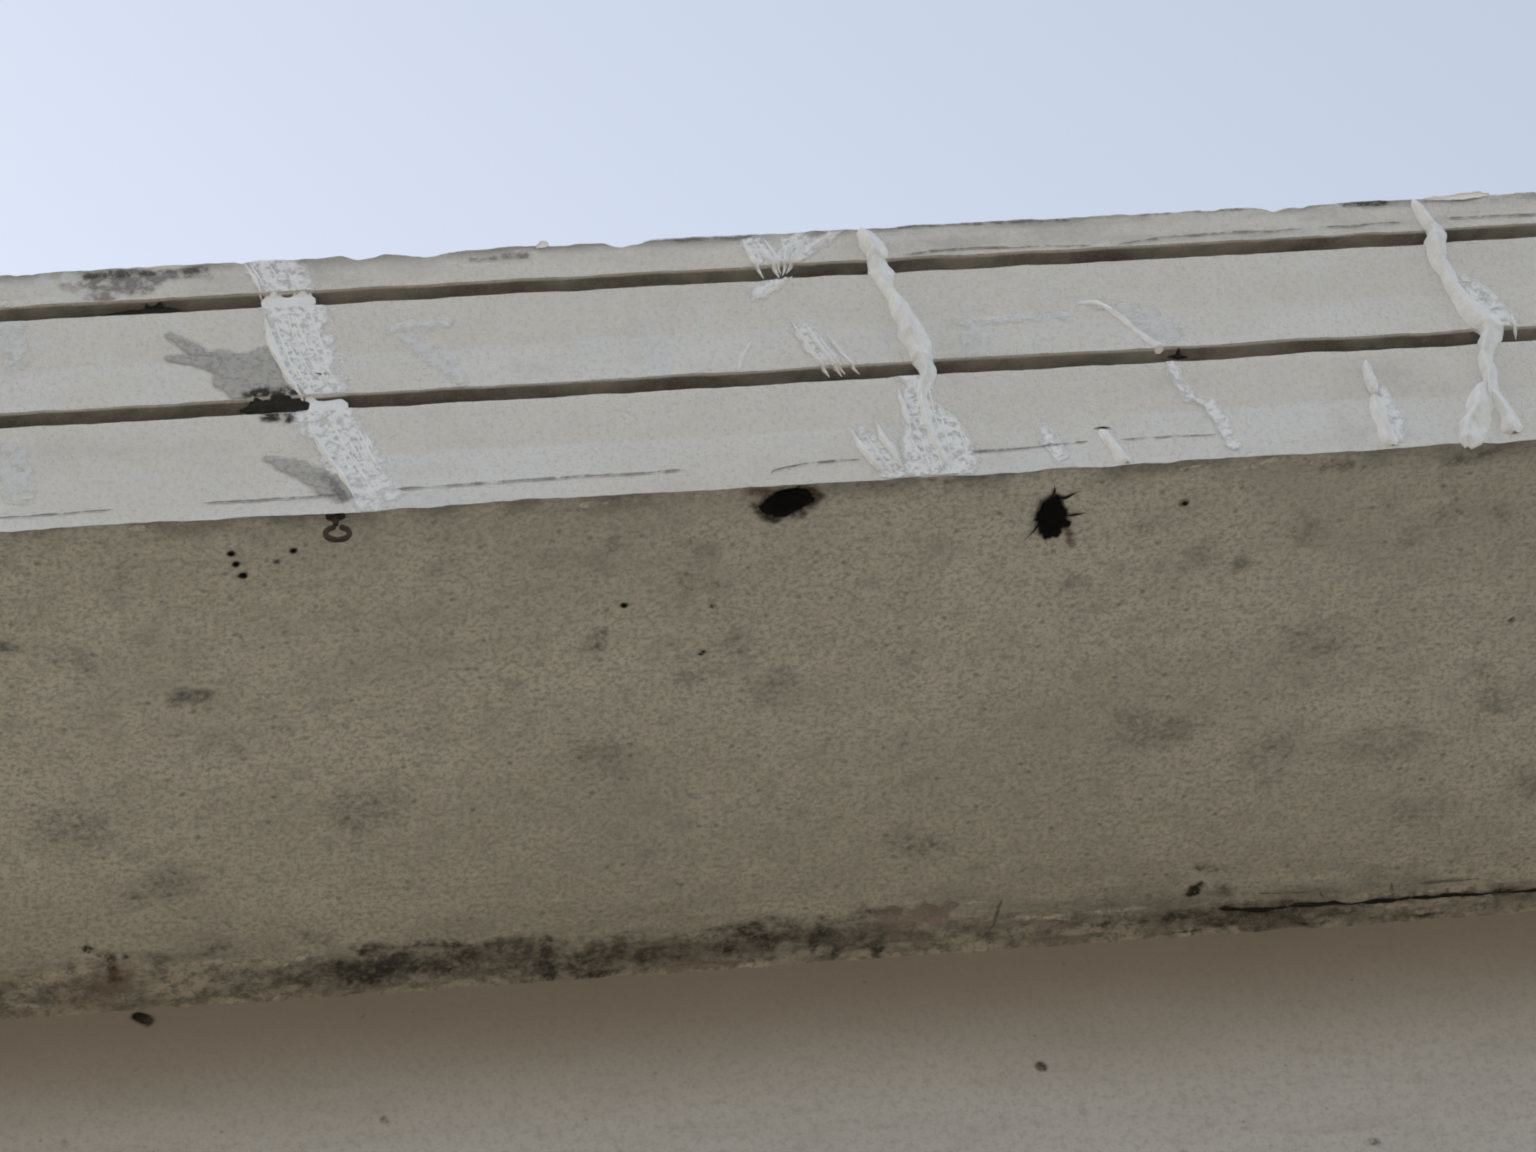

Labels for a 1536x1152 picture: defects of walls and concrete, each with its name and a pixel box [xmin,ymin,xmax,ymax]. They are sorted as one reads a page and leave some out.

crack [961,426,1214,453]
crack [397,469,686,489]
crack [771,459,859,474]
crack [208,493,341,503]
crack [0,509,113,518]
damp [1165,867,1300,932]
crack [1217,878,1536,913]
damp [283,909,883,984]